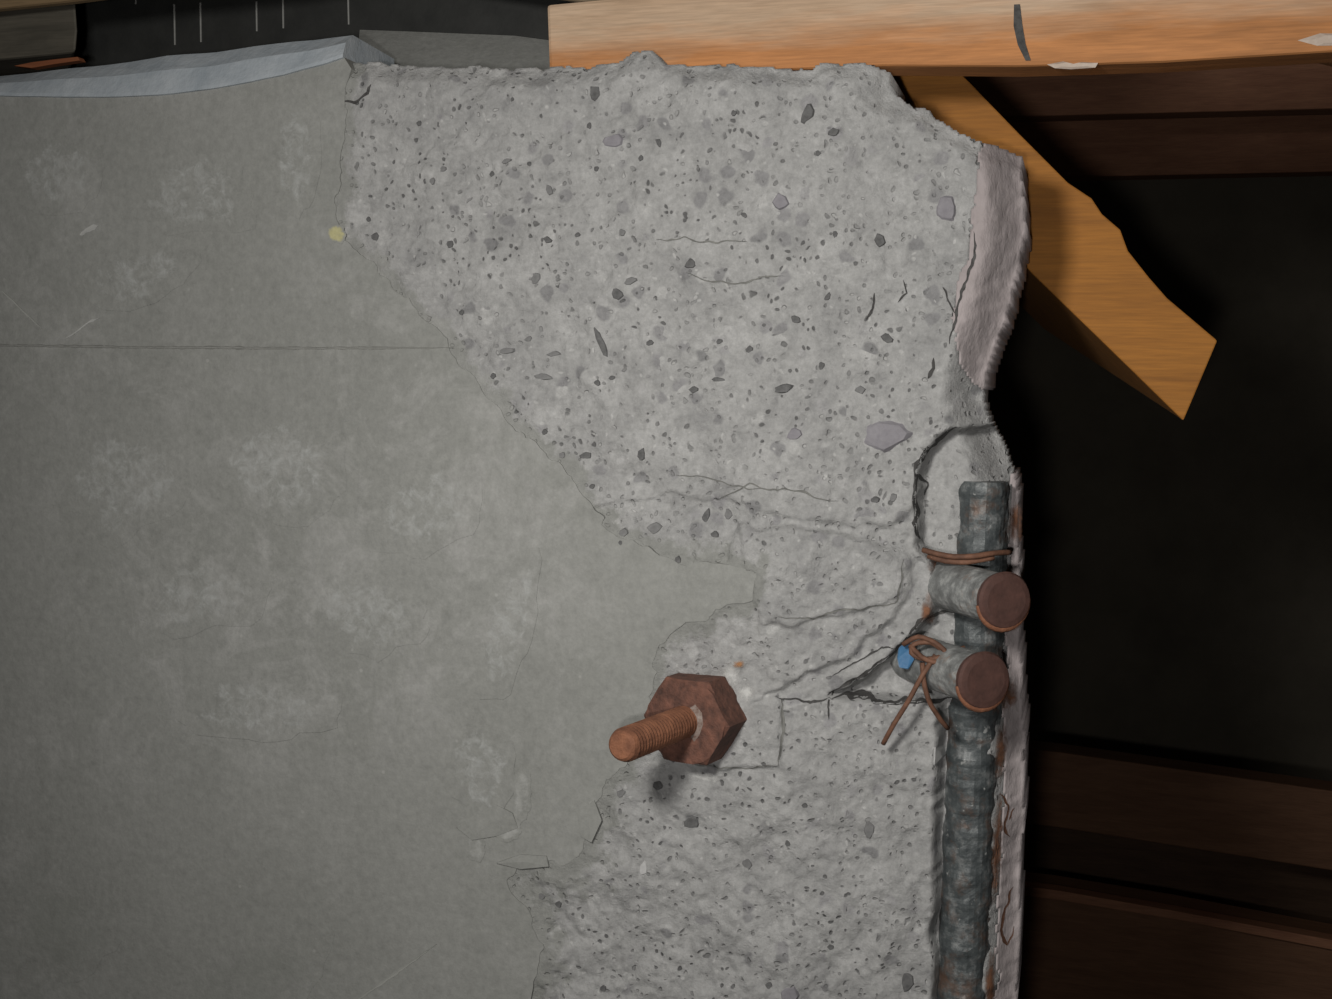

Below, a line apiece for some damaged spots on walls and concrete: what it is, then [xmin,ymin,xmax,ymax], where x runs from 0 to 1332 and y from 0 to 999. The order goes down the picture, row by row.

crack [656,236,777,285]
spalling [335,51,1031,999]
crack [677,427,957,769]
rust [997,731,1006,772]
rust [992,802,1002,888]
rust [986,961,994,999]